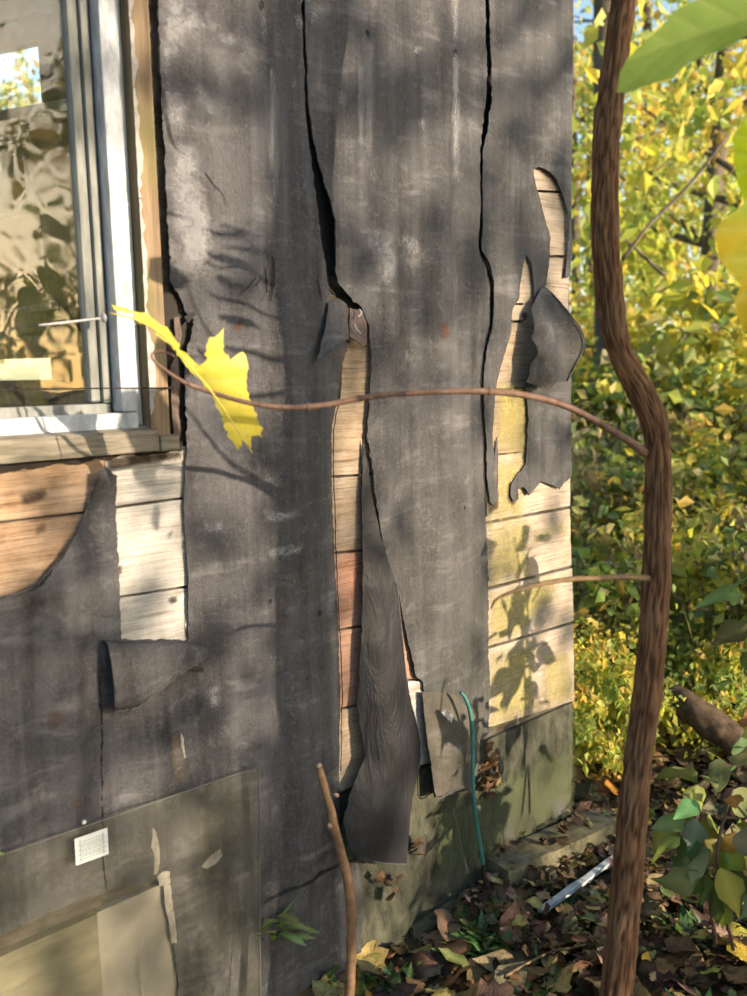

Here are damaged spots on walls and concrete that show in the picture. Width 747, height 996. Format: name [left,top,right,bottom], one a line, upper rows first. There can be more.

peeling [128,0,149,313]
crack [304,87,345,300]
crack [480,66,491,148]
peeling [0,281,190,641]
peeling [314,166,585,865]
crack [479,254,493,517]